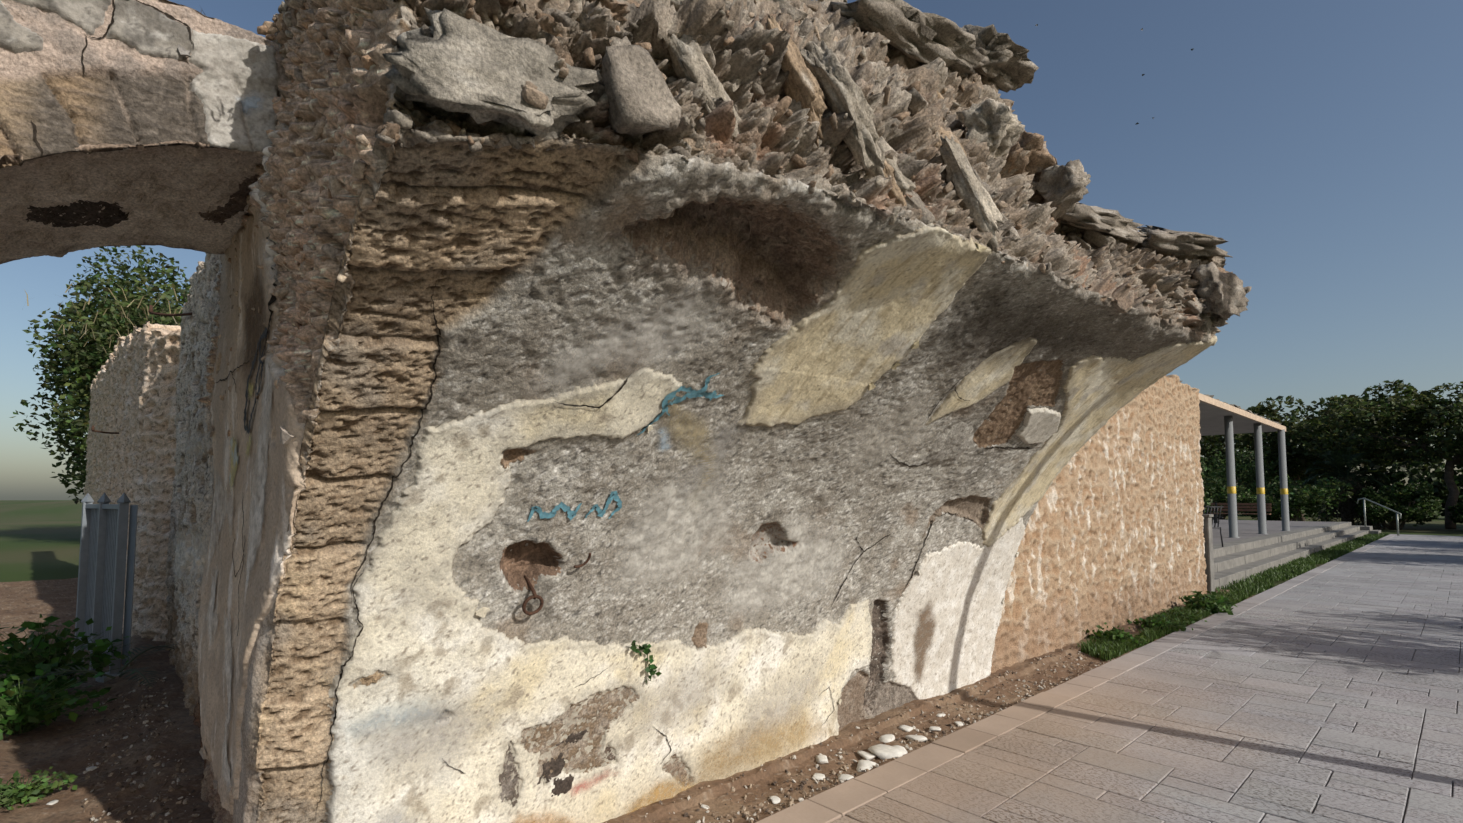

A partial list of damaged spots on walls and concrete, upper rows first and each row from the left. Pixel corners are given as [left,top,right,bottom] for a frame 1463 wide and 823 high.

spalling [25,200,129,228]
peeling [0,0,280,153]
leakage [174,126,289,789]
crack [215,237,278,385]
peeling [197,174,309,815]
crack [315,281,441,821]
peeling [324,336,1217,823]
peeling [621,197,992,427]